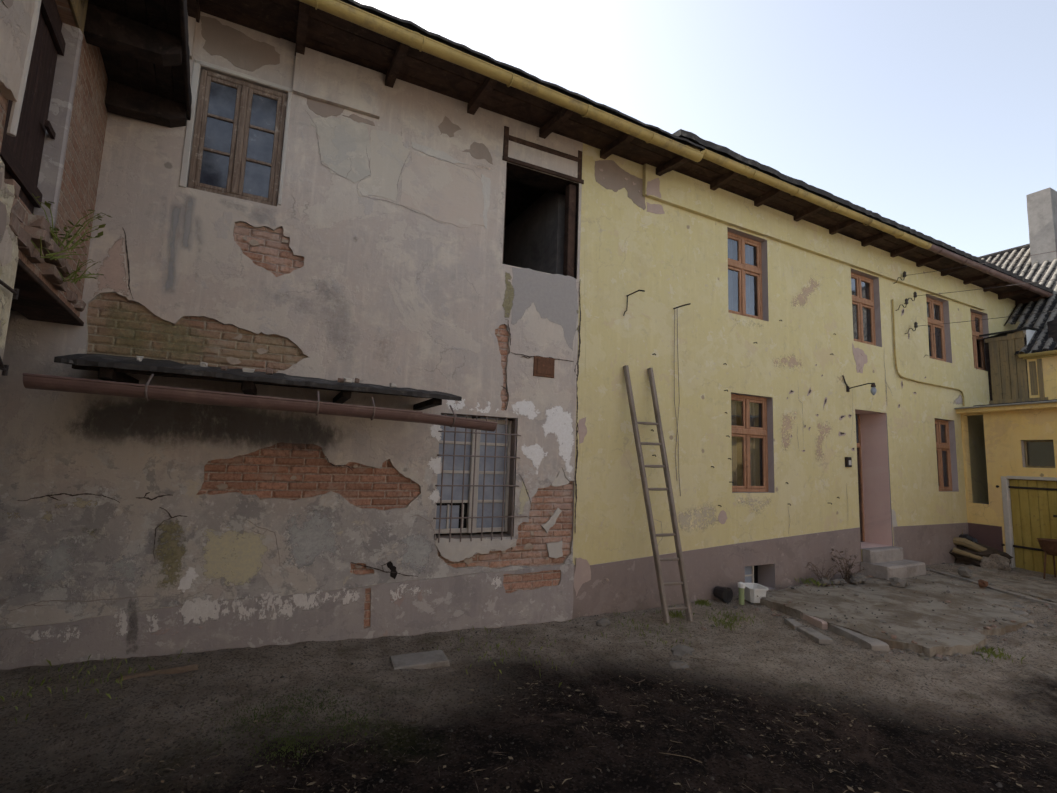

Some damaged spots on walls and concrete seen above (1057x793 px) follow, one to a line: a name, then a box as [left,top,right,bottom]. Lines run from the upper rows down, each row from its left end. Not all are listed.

crack [305,110,477,224]
spalling [233,222,304,277]
spalling [87,293,308,373]
spalling [495,324,509,411]
spalling [196,443,420,510]
crack [18,492,187,559]
water stain [155,521,186,588]
spalling [350,563,374,575]
spalling [435,468,591,596]